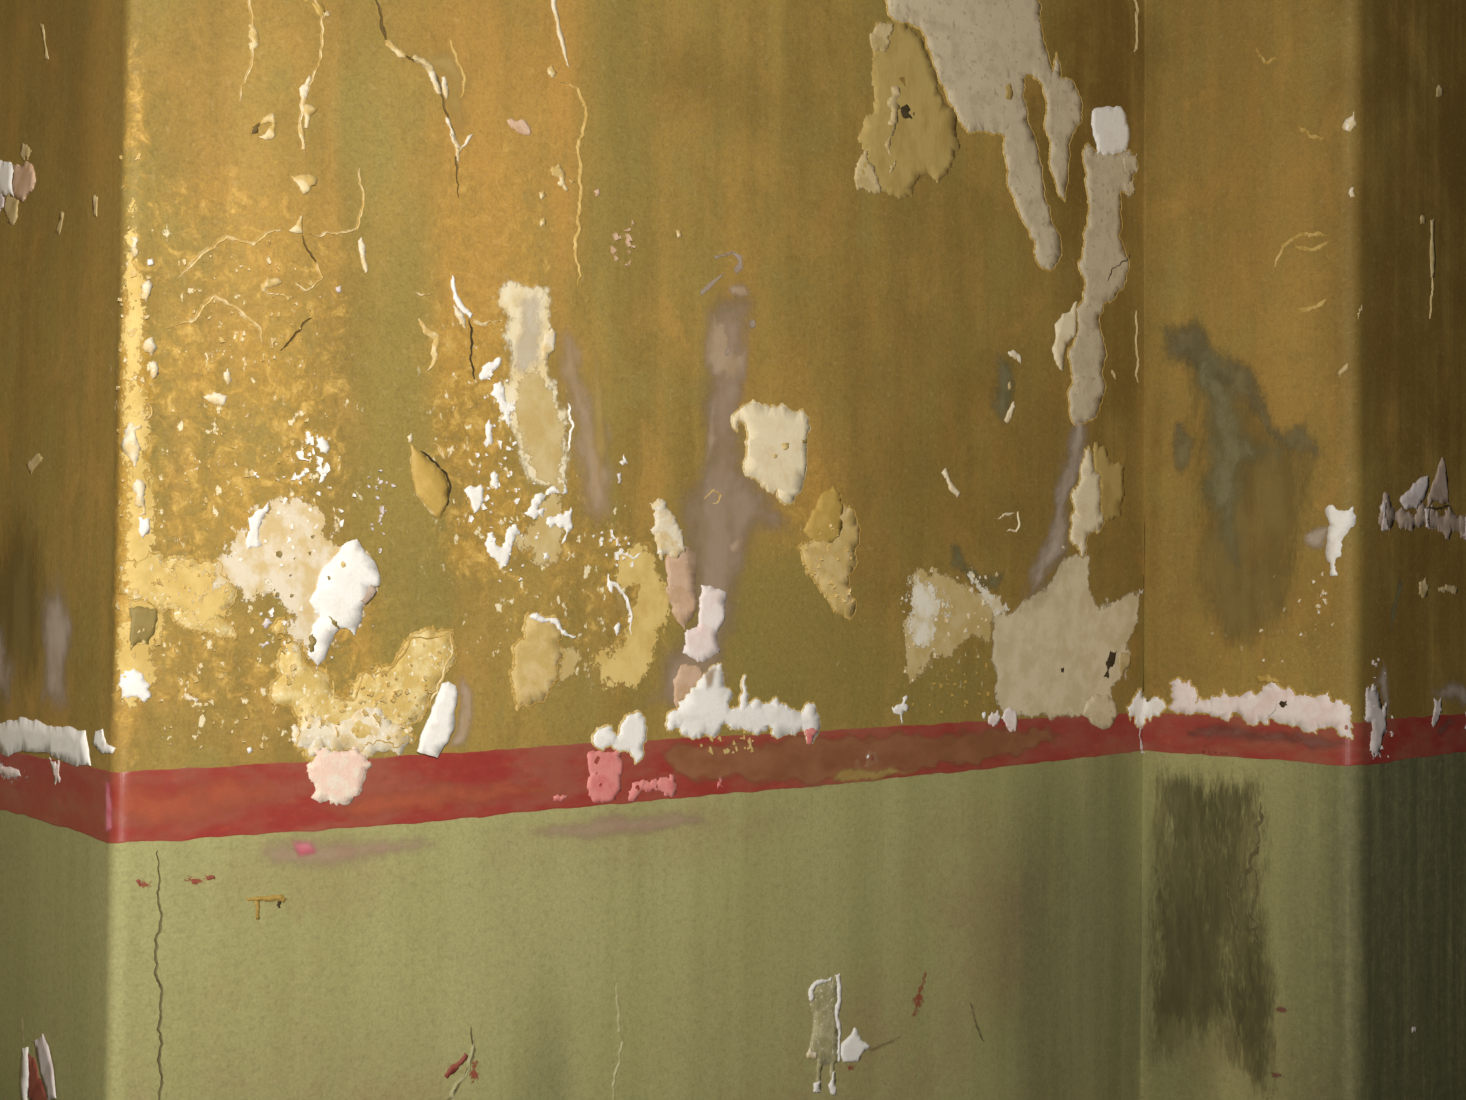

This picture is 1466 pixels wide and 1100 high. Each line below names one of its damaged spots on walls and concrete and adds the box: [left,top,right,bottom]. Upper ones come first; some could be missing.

crack [375,0,473,197]
flaking render [854,0,1139,427]
peeling [0,717,116,785]
flaking render [115,168,471,806]
flaking render [450,275,575,582]
peeling [730,399,861,621]
flaking render [508,442,1394,803]
damp [1164,327,1318,637]
peeling [1378,457,1466,541]
crack [153,850,163,1100]
peeling [806,973,890,1095]
damp [1154,779,1286,1082]